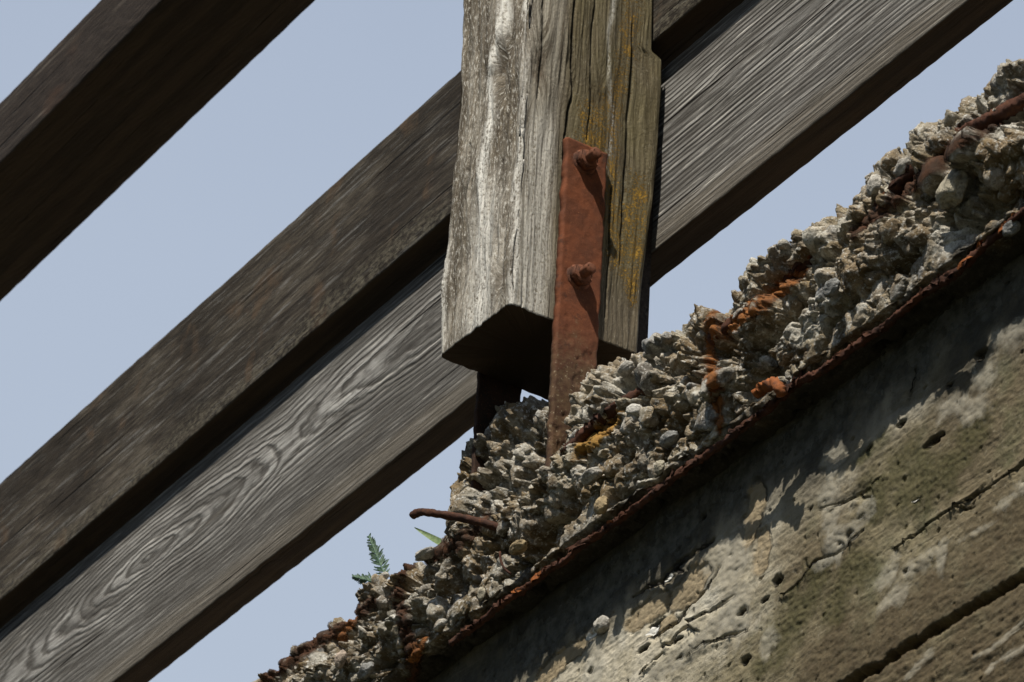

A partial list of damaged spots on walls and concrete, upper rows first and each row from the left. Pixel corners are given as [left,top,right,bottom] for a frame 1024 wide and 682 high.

rust [390,511,490,682]
rust [570,410,621,462]
spalling [253,59,1024,682]
rust [703,269,807,435]
crack [780,529,864,594]
crack [893,469,1020,549]